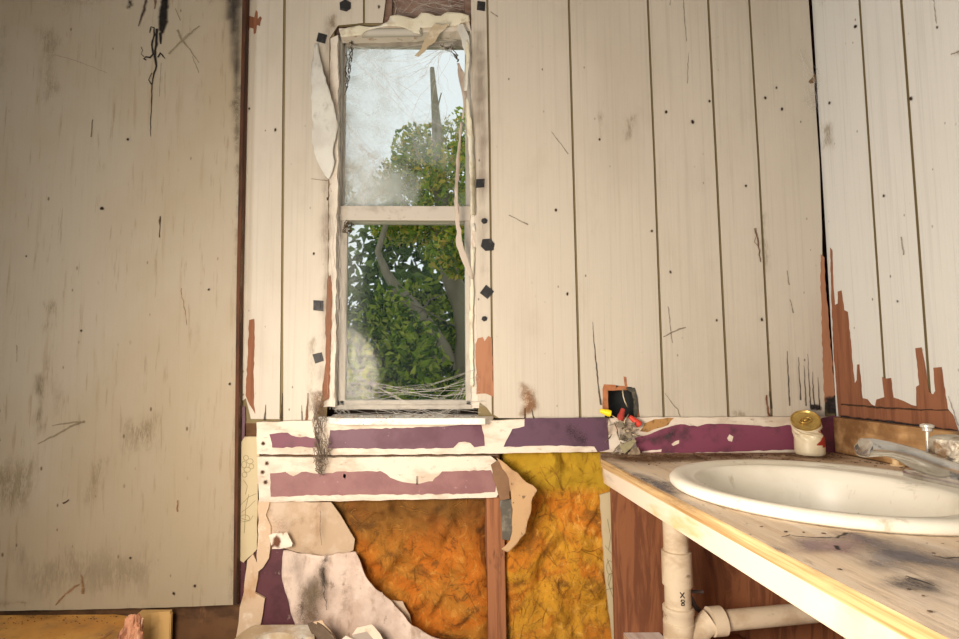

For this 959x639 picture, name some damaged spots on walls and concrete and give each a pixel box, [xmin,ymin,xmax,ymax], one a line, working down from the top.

water stain [228,0,240,74]
peeling [269,425,485,449]
peeling [504,417,609,452]
peeling [635,410,794,453]
peeling [821,397,842,454]
peeling [270,470,496,497]
peeling [238,560,246,604]